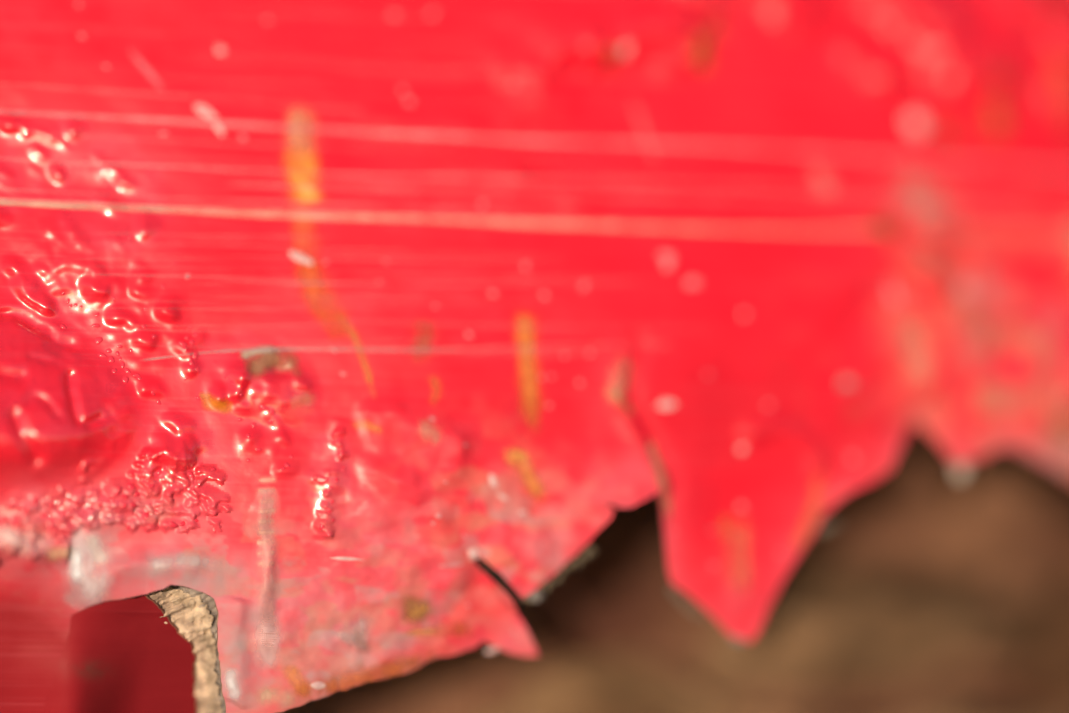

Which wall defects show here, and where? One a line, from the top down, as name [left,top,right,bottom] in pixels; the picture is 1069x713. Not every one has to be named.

corrosion [289,111,358,347]
corrosion [517,316,537,421]
peeling [489,474,509,501]
peeling [438,548,479,568]
spalling [520,546,596,604]
spalling [145,585,226,713]